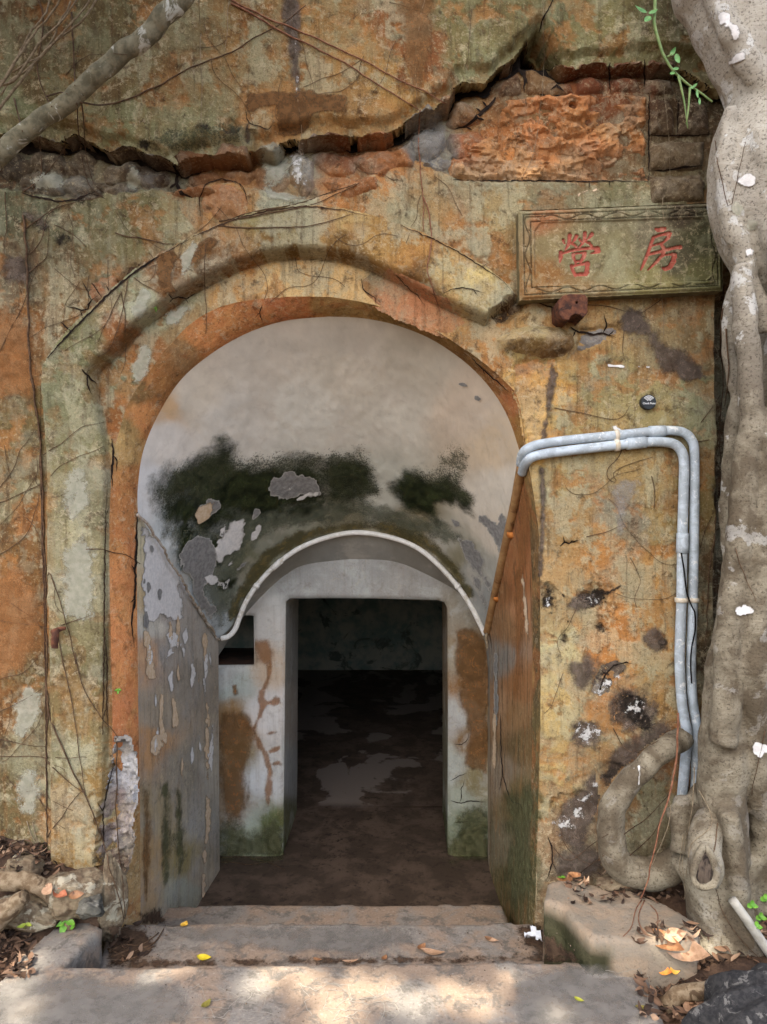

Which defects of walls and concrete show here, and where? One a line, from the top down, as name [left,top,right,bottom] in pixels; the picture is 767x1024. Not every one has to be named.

spalling [0,60,712,203]
crack [387,0,576,147]
crack [454,59,720,188]
crack [4,113,367,358]
peeling [268,471,321,501]
leakage [151,437,474,626]
corrosion [513,493,530,692]
spalling [96,498,261,875]
corrosion [220,641,280,819]
corrosion [455,629,499,784]
spalling [591,660,626,695]